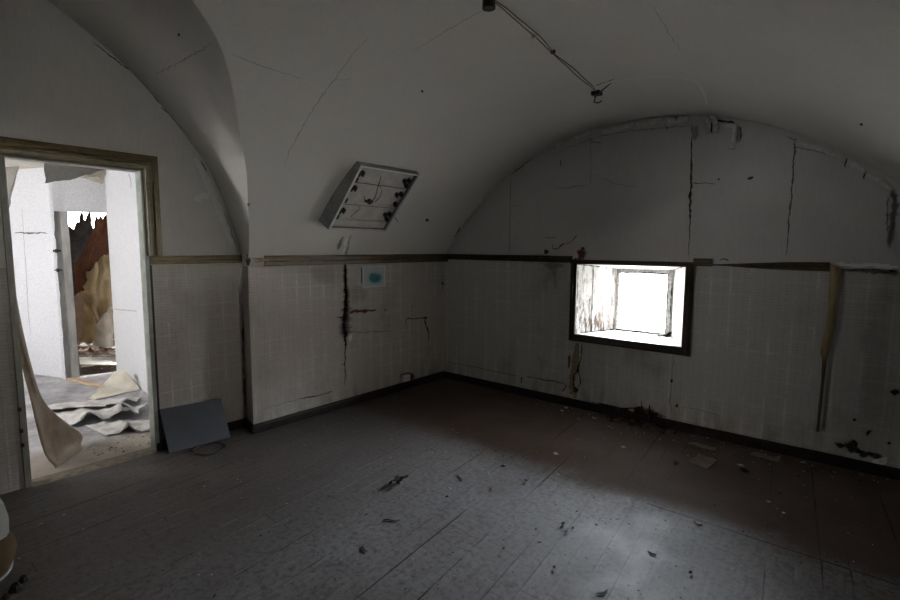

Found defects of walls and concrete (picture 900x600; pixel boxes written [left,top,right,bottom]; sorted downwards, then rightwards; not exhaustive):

crack [521,125,716,393]
crack [786,136,824,253]
water stain [886,194,899,245]
crack [297,264,353,400]